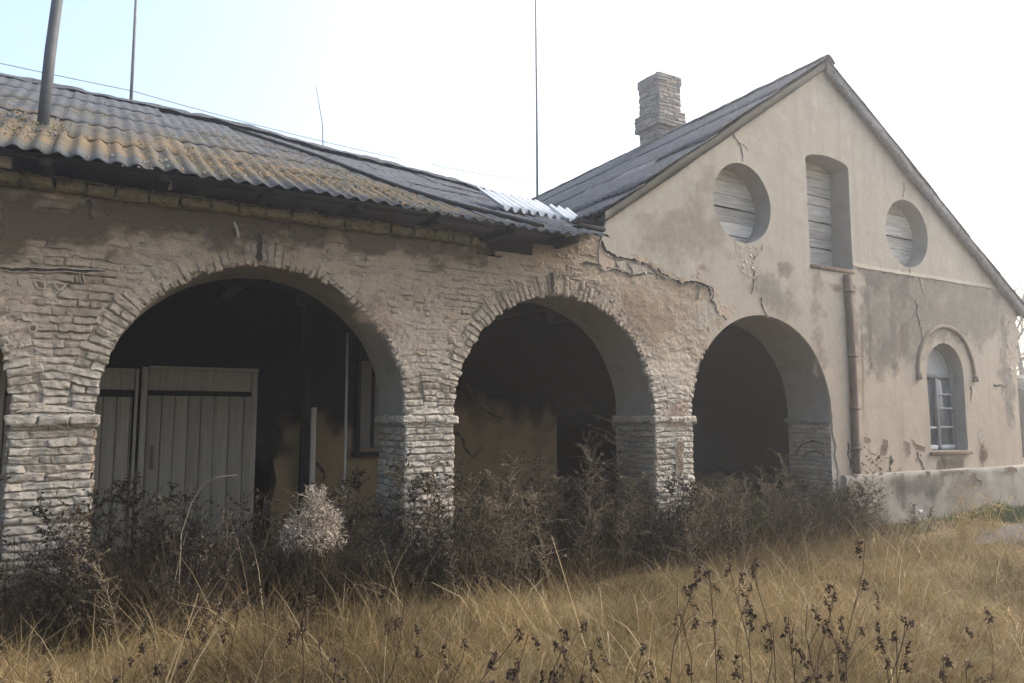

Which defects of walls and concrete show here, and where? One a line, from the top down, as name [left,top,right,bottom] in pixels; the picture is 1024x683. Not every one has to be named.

crack [732,134,748,162]
spalling [599,248,659,279]
crack [583,240,727,321]
spalling [735,241,762,279]
crack [908,269,924,341]
water stain [858,268,1015,424]
crack [454,431,483,458]
crack [796,440,862,500]
spalling [863,436,889,472]
spalling [903,438,926,458]